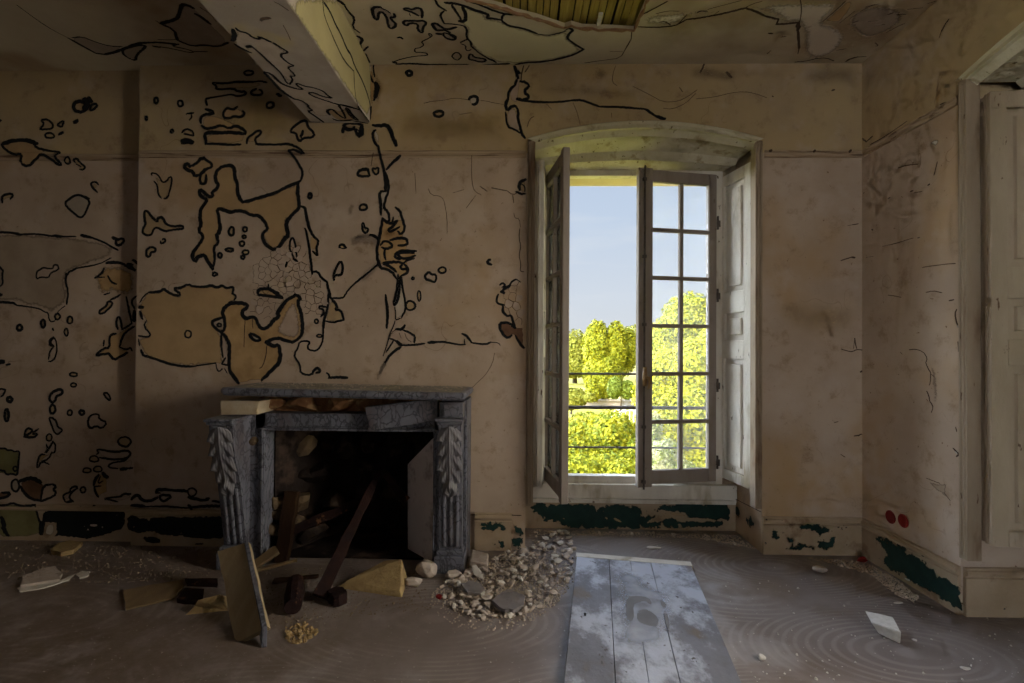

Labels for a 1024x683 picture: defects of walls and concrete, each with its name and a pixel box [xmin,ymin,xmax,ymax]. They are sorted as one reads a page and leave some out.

flaking render [370,0,585,139]
crack [426,0,802,127]
flaking render [0,0,370,385]
crack [244,205,406,379]
flaking render [495,279,525,349]
peeling [0,372,223,556]
peeling [471,499,761,550]
peeling [765,524,847,550]
peeling [876,536,962,611]